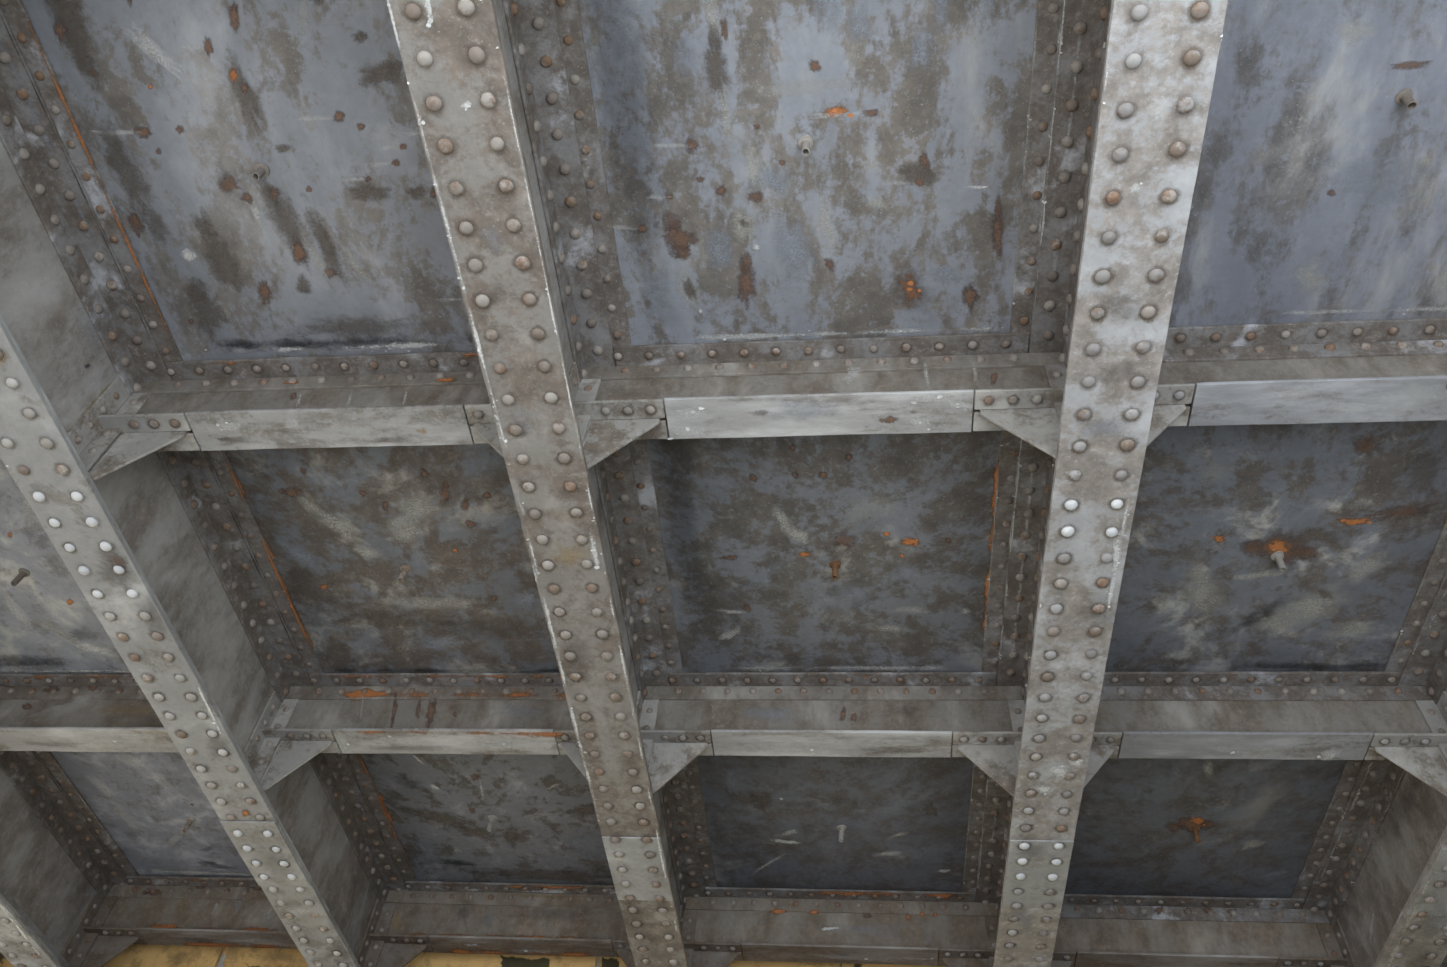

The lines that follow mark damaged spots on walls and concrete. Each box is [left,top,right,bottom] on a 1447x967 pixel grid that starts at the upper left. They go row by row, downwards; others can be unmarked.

corrosion [229,3,239,31]
corrosion [823,107,878,118]
corrosion [220,174,342,278]
corrosion [900,274,921,301]
corrosion [1244,506,1428,564]